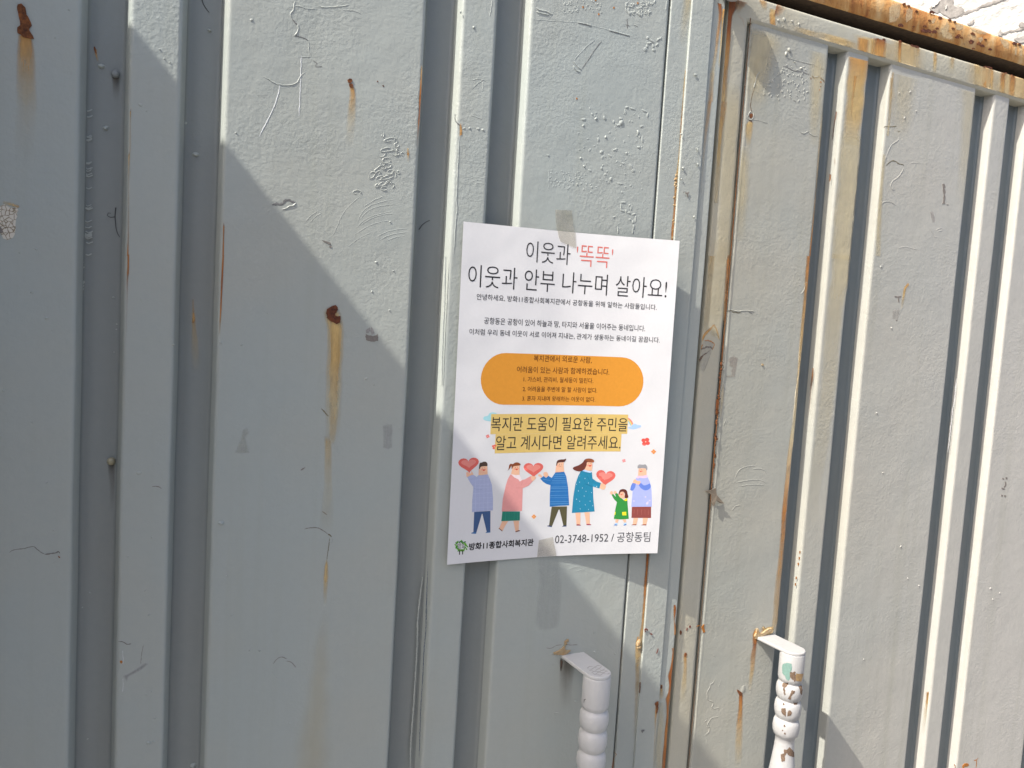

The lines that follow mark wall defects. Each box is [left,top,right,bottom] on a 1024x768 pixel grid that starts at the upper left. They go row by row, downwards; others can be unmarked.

rust [17,4,34,67]
crack [262,1,362,86]
rust [898,41,914,66]
rust [976,65,1024,99]
rust [826,35,885,283]
peeling [0,204,18,240]
rust [798,198,816,389]
rust [326,305,341,413]
rust [655,0,754,768]
rust [778,406,796,578]
rust [638,553,653,658]